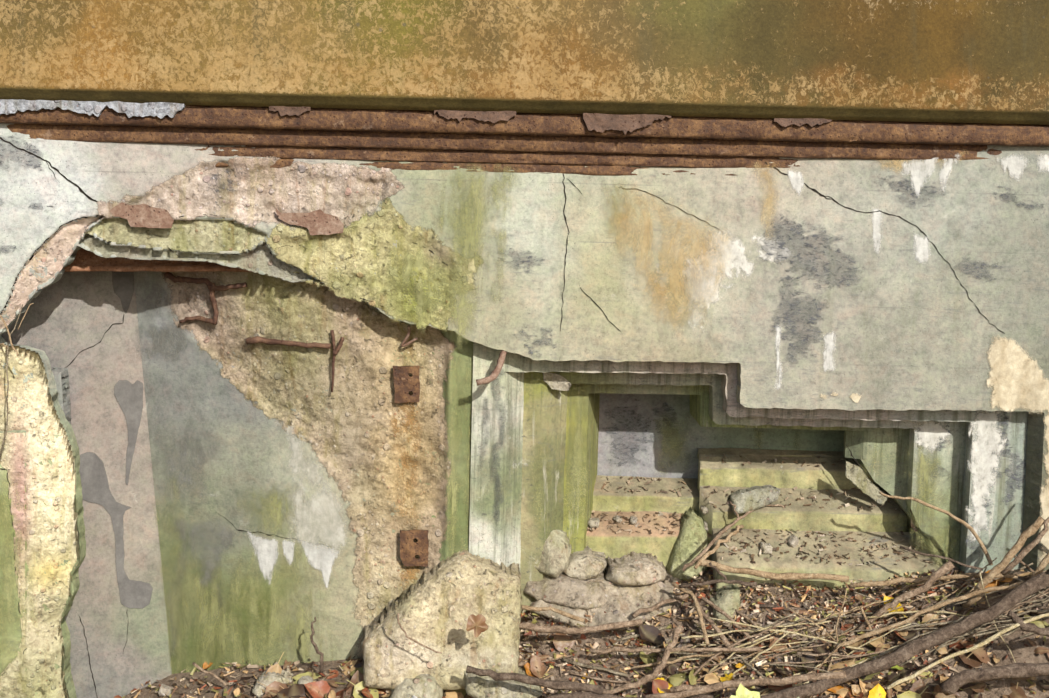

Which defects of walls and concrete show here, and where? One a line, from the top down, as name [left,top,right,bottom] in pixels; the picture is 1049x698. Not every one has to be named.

crack [0,137,111,315]
peeling [0,99,185,119]
corrosion [434,110,516,123]
crack [560,174,620,331]
corrosion [583,113,671,135]
leakage [654,217,864,388]
corrosion [773,118,832,127]
crack [759,159,1005,334]
leakage [880,158,956,208]
spalling [0,156,484,698]
leakage [250,426,345,587]
peeling [987,337,1049,561]